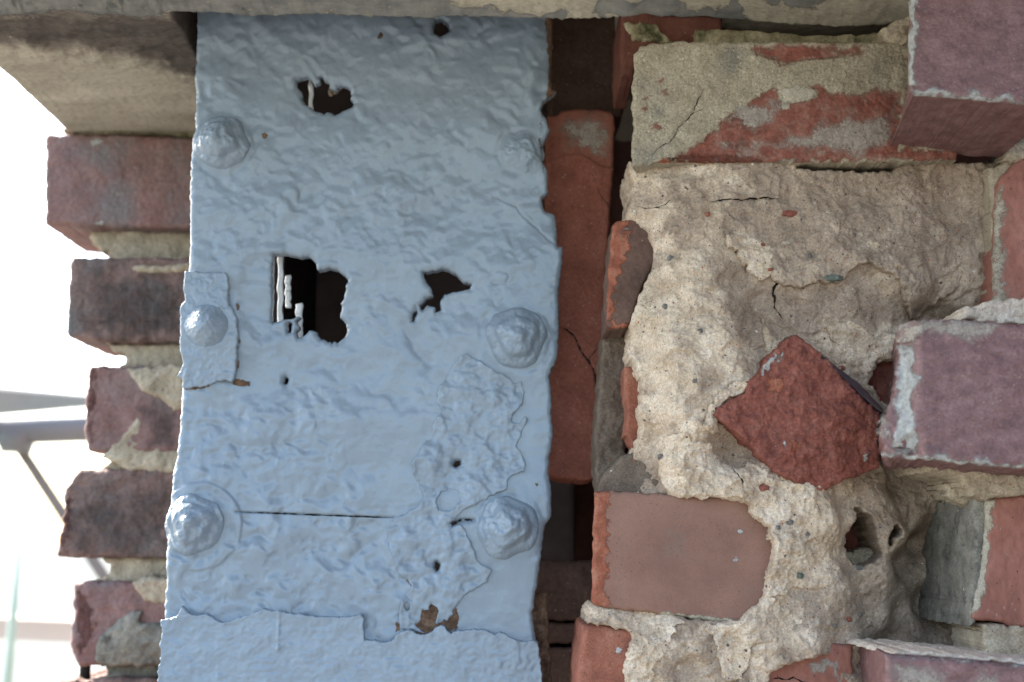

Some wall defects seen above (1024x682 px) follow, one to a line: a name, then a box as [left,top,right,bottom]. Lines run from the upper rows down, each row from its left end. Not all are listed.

spalling [754,43,862,64]
crack [653,90,704,154]
spalling [657,84,957,164]
crack [712,195,779,203]
crack [772,283,784,319]
crack [560,327,596,386]
corrosion [415,604,459,634]